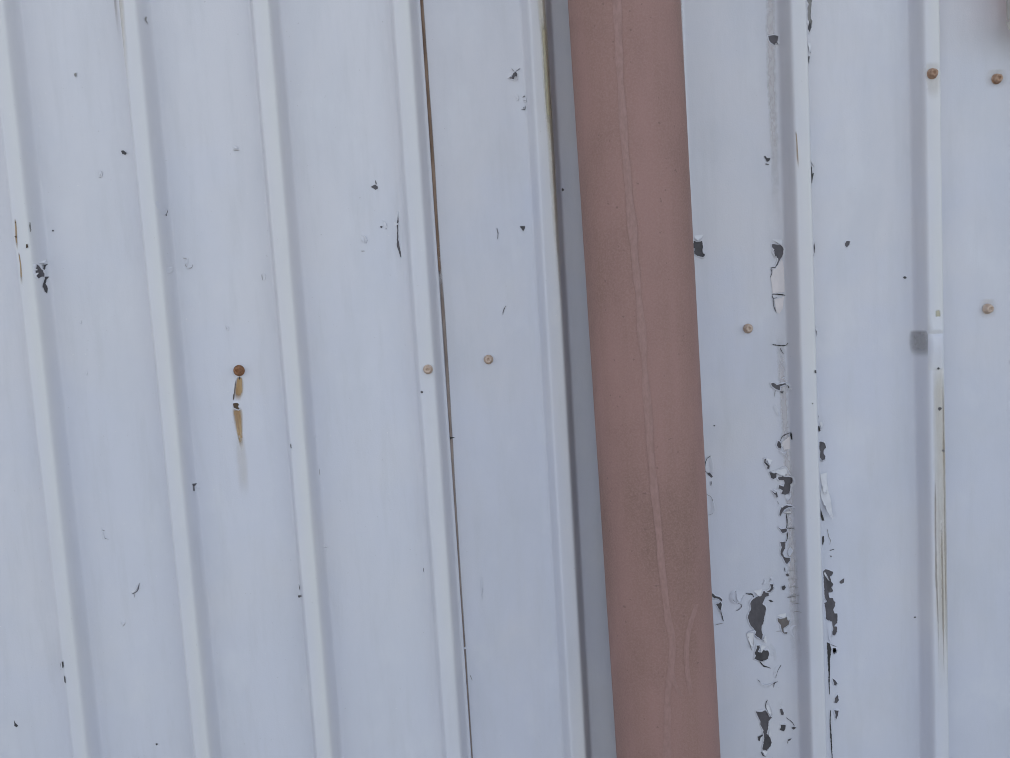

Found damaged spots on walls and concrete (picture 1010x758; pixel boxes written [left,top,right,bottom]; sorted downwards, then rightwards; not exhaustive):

peeling [32,259,49,293]
peeling [693,235,706,259]
peeling [770,239,785,313]
corrosion [232,377,242,443]
peeling [770,377,793,416]
peeling [763,433,796,517]
peeling [818,416,833,521]
peeling [746,570,798,669]
peeling [822,568,844,655]
peeling [755,699,796,757]
spalling [832,678,840,720]